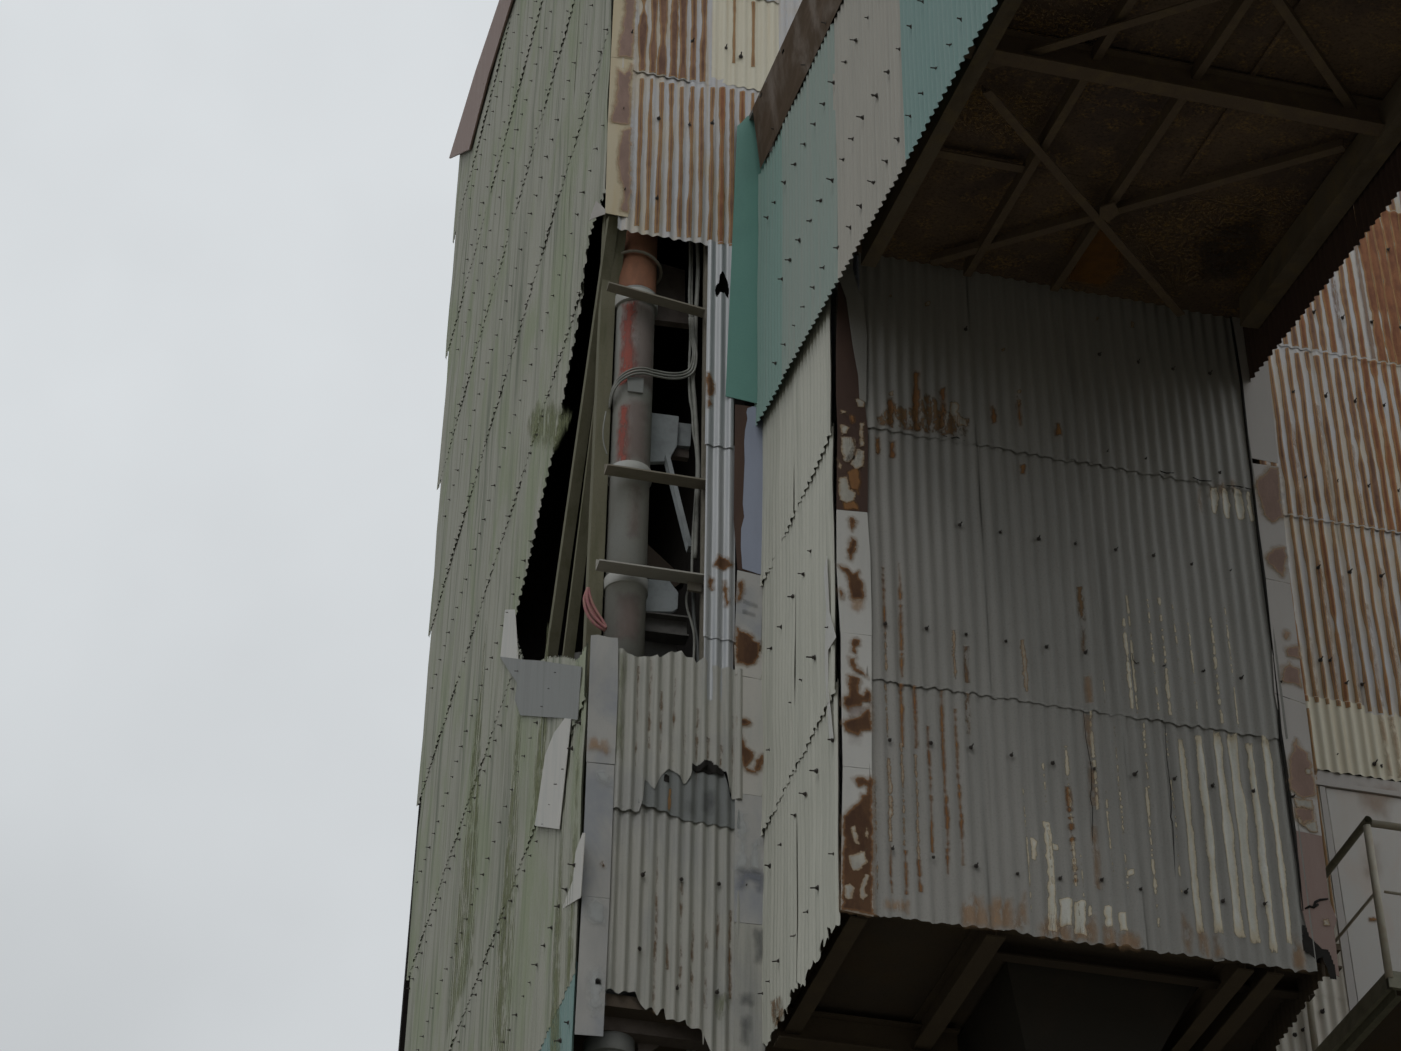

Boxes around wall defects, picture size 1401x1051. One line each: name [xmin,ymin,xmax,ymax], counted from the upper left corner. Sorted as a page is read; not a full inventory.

corrosion [611,0,755,294]
corrosion [876,372,969,458]
peeling [836,398,865,599]
peeling [1210,467,1284,522]
peeling [1265,547,1288,577]
corrosion [1260,199,1401,913]
corrosion [735,627,760,666]
peeling [1147,598,1195,715]
peeling [1122,595,1160,927]
peeling [1166,608,1318,953]
peeling [1022,789,1128,936]